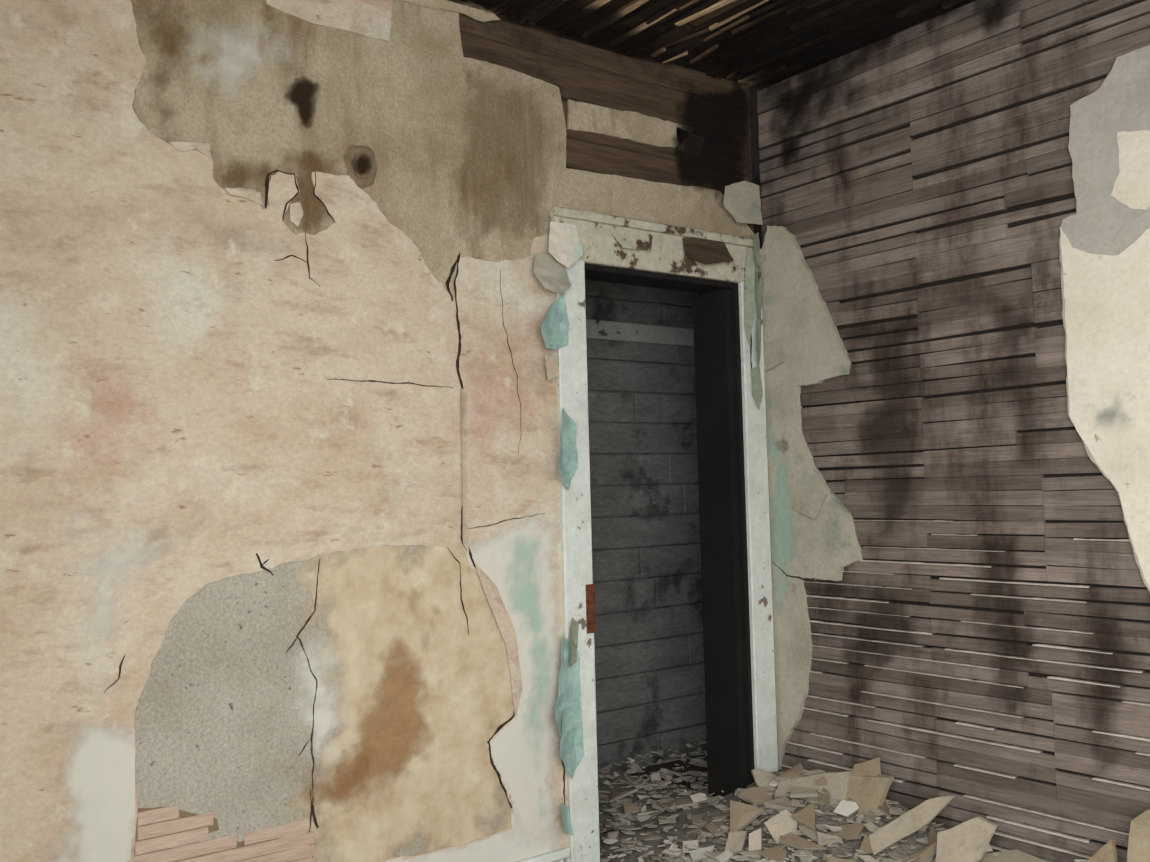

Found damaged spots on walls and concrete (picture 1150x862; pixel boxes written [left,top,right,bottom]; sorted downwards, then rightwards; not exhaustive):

damp [288,79,317,126]
flaking render [130,0,783,410]
flaking render [59,559,340,862]
crack [287,559,320,858]
damp [280,545,514,862]
crack [327,253,545,808]
peeling [384,519,584,862]
peeling [558,408,578,490]
damp [864,600,905,660]
damp [1091,628,1124,722]